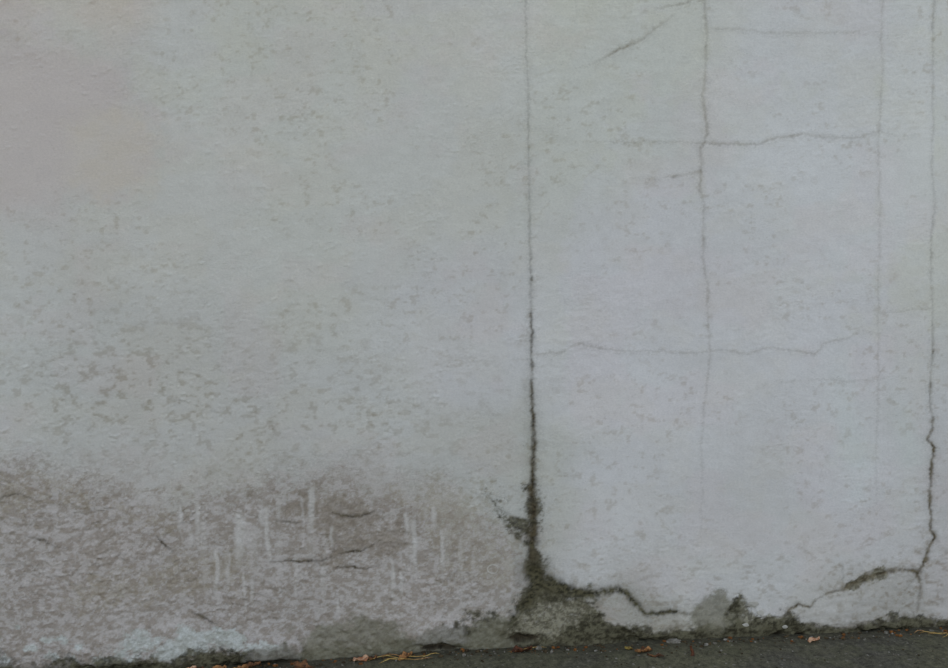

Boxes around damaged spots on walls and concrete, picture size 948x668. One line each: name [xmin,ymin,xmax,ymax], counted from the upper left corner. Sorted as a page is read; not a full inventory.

crack [482,0,942,647]
water stain [0,435,518,668]
flaking render [527,608,579,639]